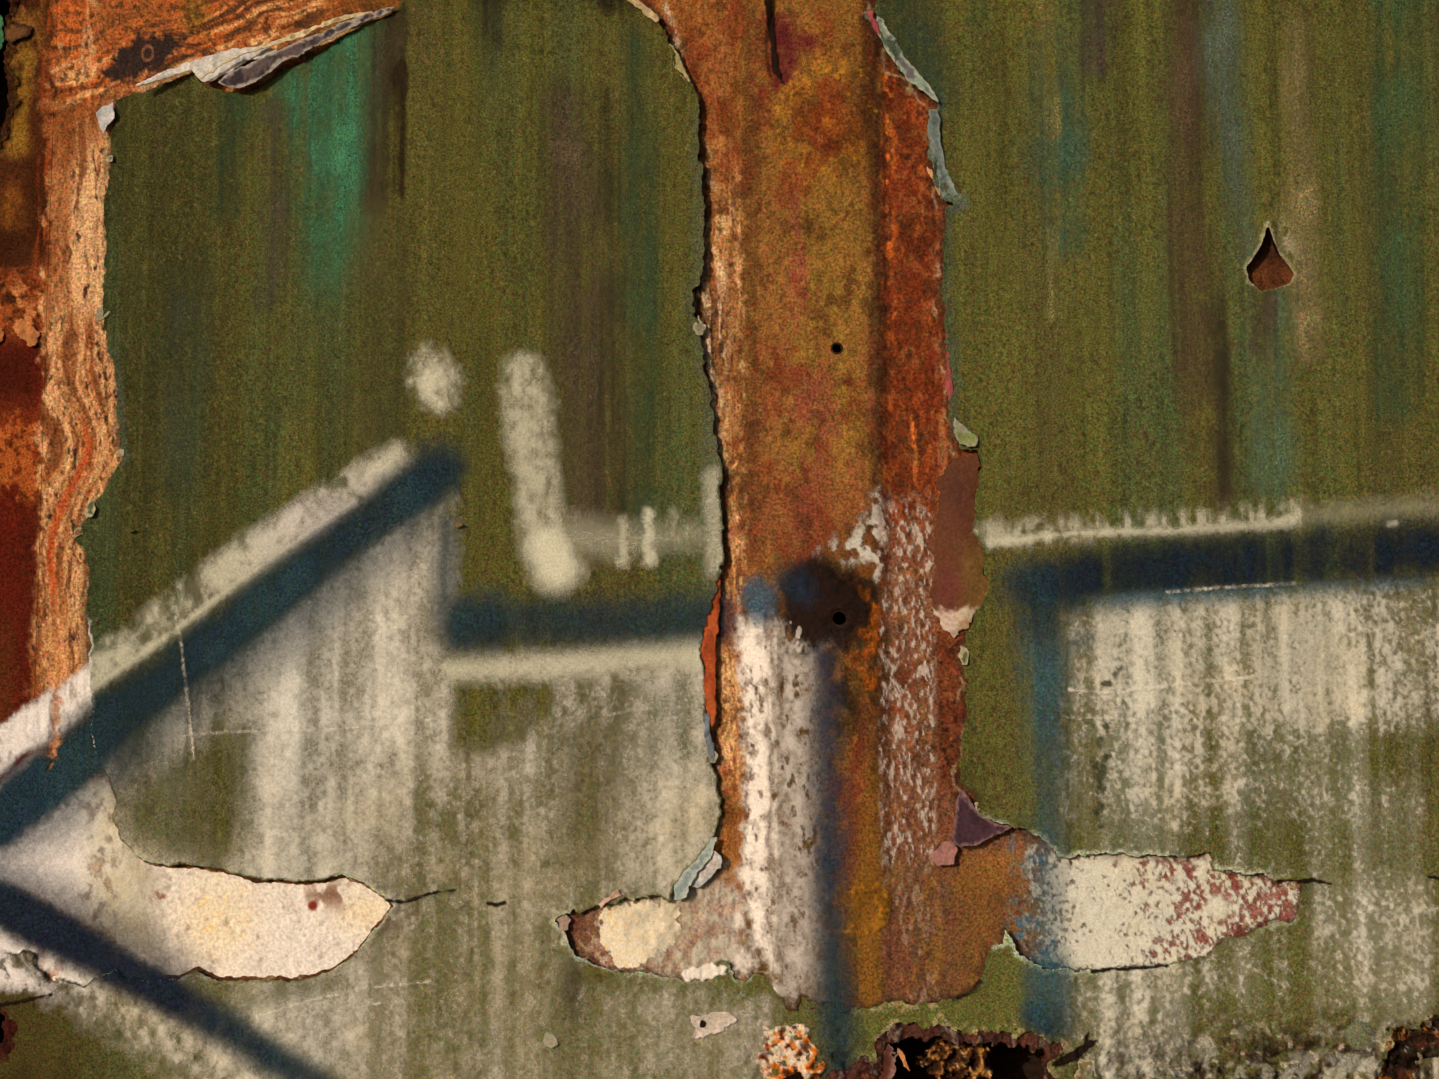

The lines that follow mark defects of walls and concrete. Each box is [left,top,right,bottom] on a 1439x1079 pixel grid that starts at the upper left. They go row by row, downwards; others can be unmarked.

peeling [0,0,402,785]
peeling [555,0,1302,1012]
rust [784,557,880,653]
peeling [68,772,394,982]
rust [828,879,890,938]
peeling [3,949,98,986]
peeling [877,1044,910,1079]
peeling [1074,1059,1097,1079]